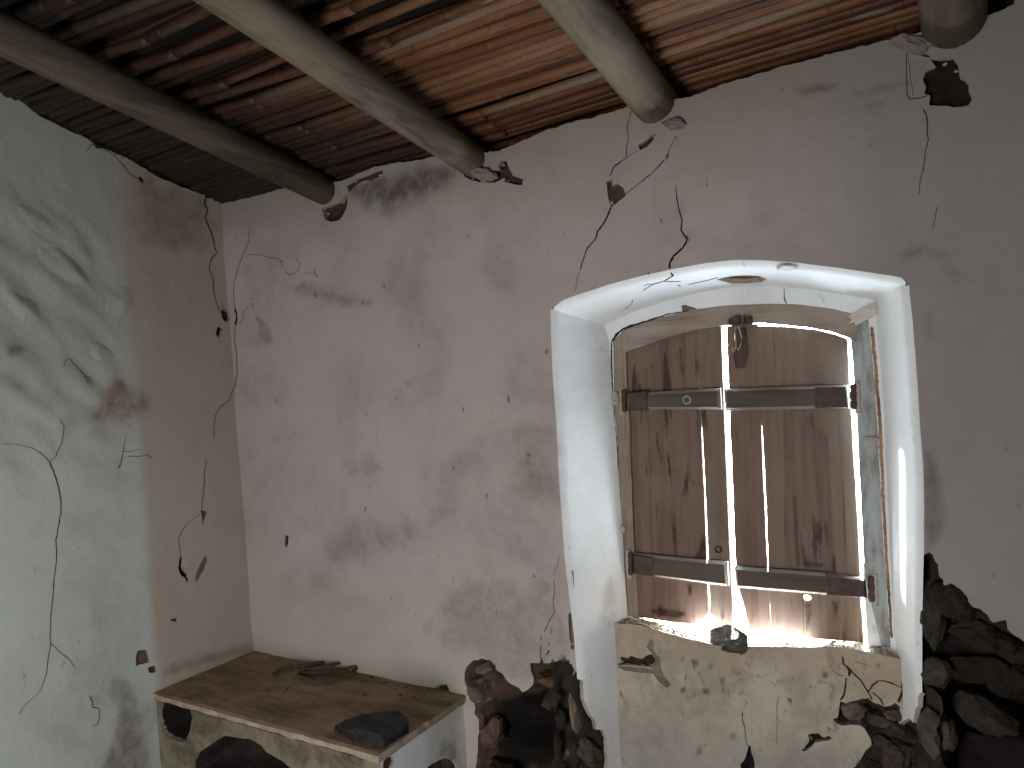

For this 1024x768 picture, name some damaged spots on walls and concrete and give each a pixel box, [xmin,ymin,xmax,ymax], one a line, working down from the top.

crack [575,112,678,289]
crack [906,53,937,231]
spalling [923,60,971,107]
crack [204,197,318,430]
crack [13,422,75,714]
flaking render [466,658,605,768]
crack [831,656,903,706]
flaking render [837,552,1024,768]